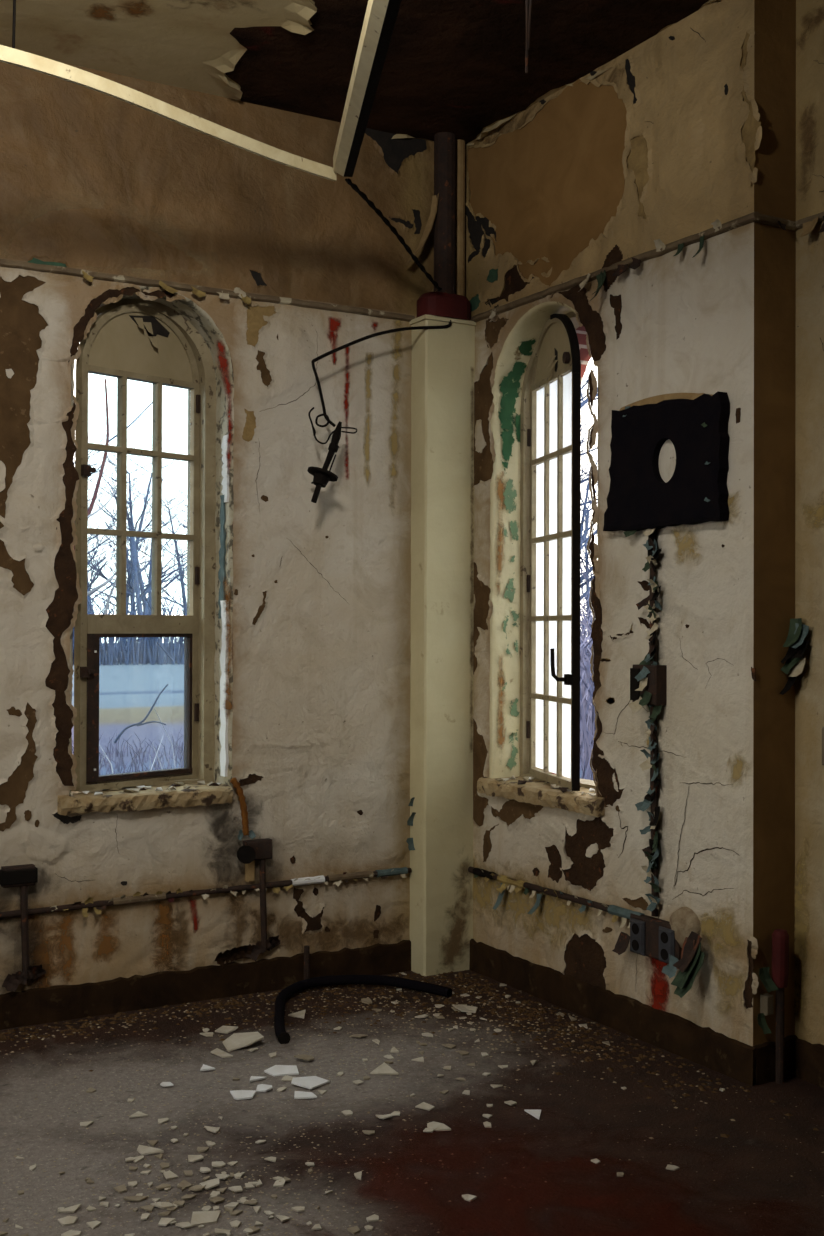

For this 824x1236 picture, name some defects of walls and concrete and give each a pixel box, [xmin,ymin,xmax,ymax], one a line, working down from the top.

flaking render [203,0,368,123]
peeling [724,29,762,187]
peeling [0,255,280,599]
flaking render [364,0,722,998]
flaking render [0,394,83,831]
crack [604,701,739,900]
leakage [29,911,75,988]
leakage [94,913,117,960]
leakage [154,900,187,972]
leakage [230,892,403,952]
flaking render [741,935,779,1034]